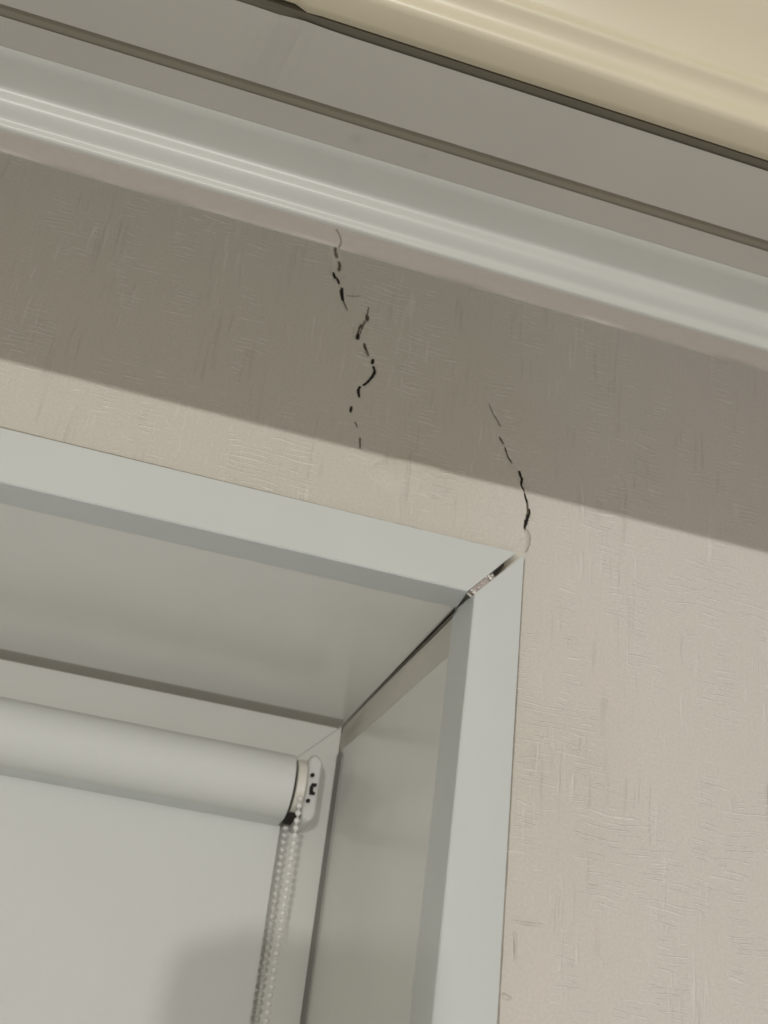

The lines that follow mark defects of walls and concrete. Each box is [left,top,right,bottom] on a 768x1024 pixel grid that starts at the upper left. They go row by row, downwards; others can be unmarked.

crack [333,229,378,448]
crack [490,407,530,529]